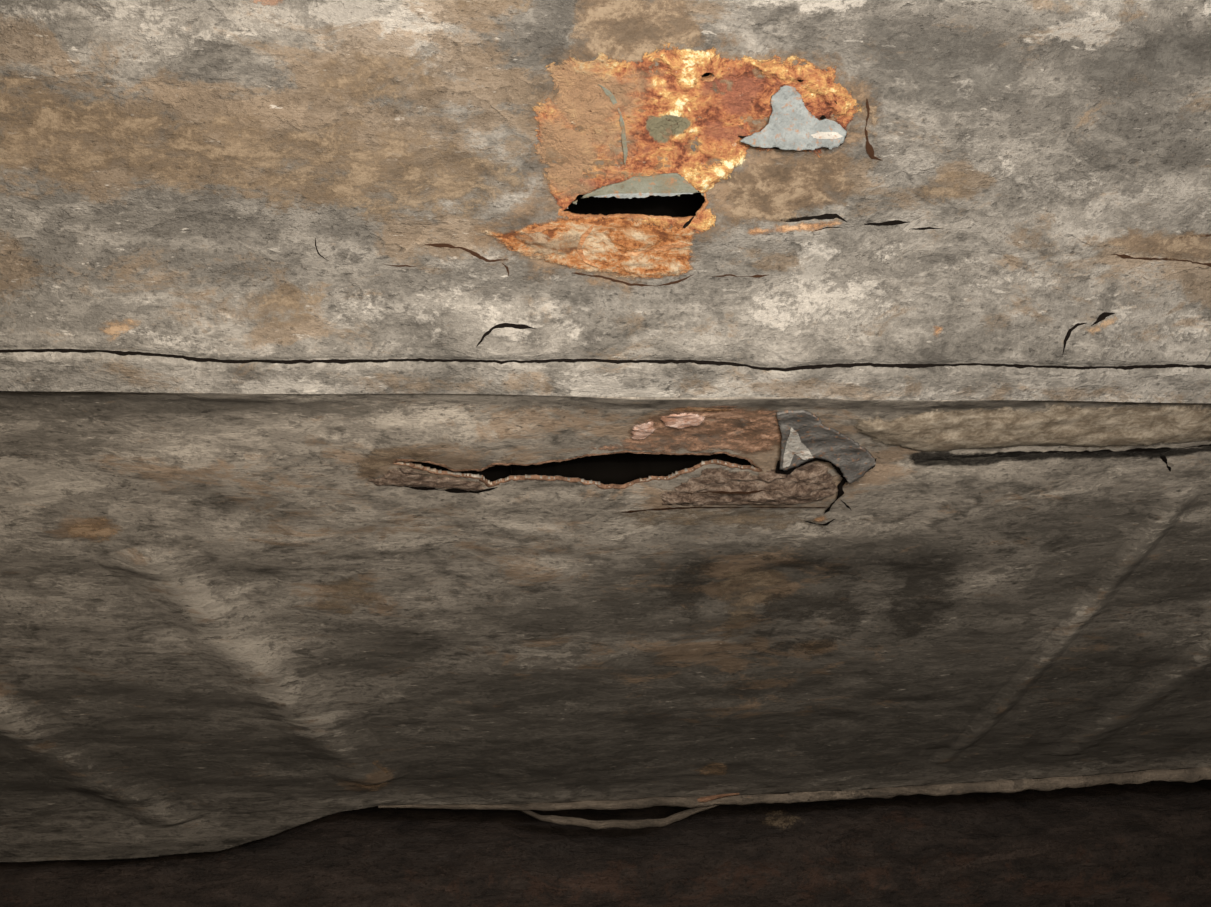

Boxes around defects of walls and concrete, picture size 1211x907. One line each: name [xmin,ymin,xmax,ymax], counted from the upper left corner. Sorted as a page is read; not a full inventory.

peeling [738,85,847,151]
corrosion [0,43,872,273]
spalling [483,173,704,286]
crack [774,214,942,232]
crack [0,312,1211,372]